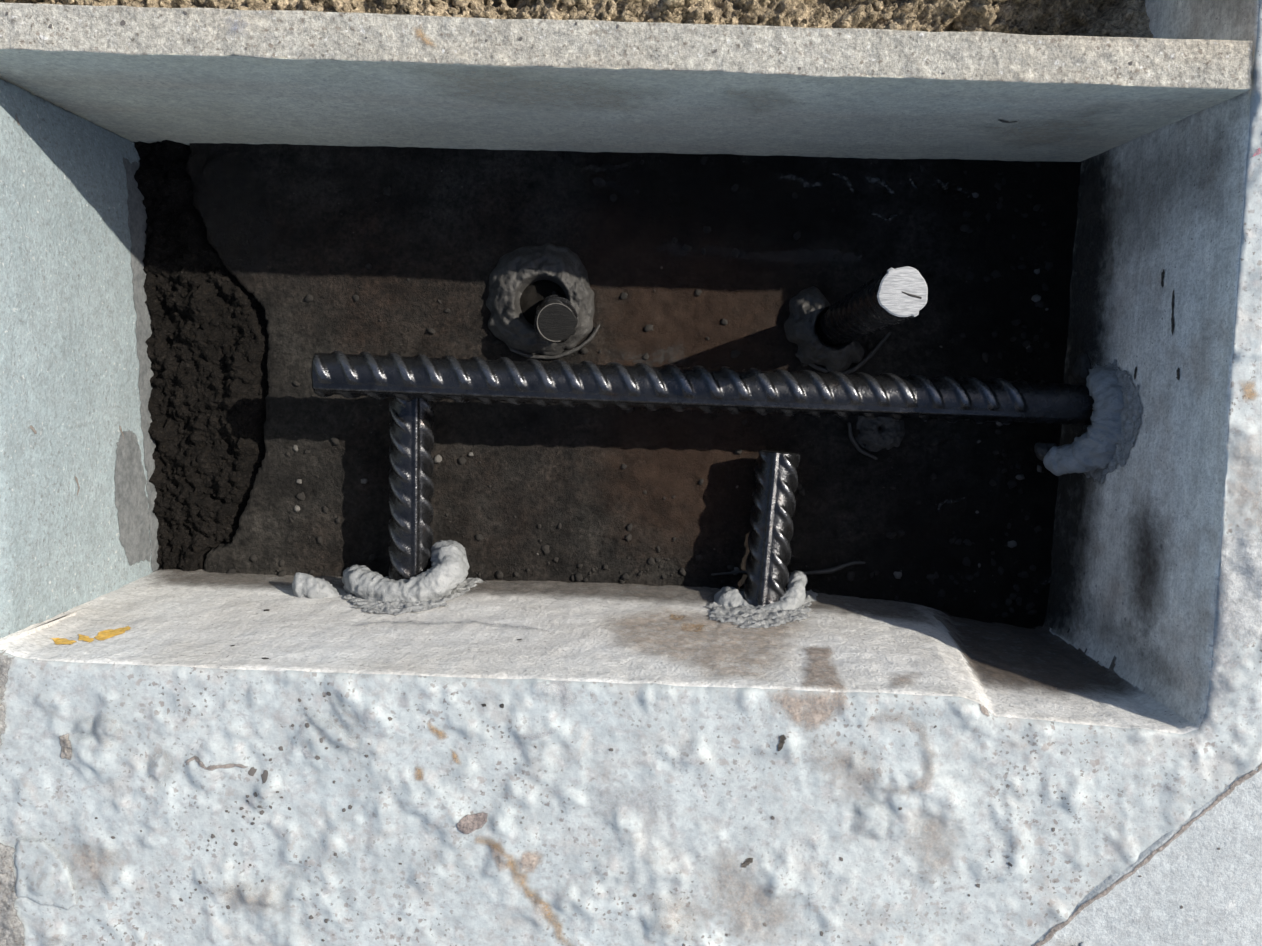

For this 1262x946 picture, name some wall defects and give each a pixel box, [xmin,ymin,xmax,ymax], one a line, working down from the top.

peeling [114,430,151,566]
water stain [1134,519,1160,612]
crack [979,704,989,716]
rust [482,841,560,931]
crack [1034,764,1262,946]